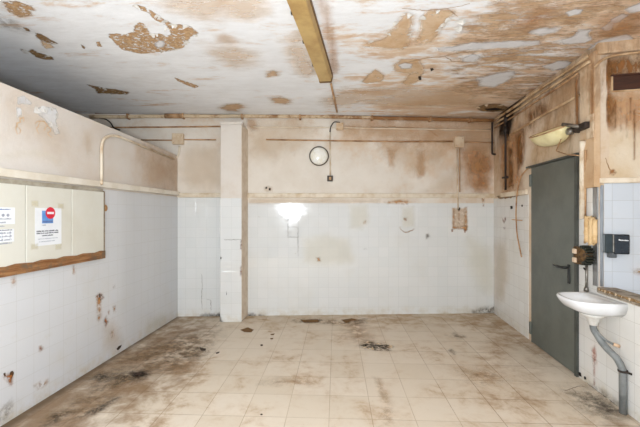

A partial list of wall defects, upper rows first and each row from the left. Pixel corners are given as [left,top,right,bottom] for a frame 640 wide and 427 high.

peeling [3,1,35,17]
peeling [21,33,58,60]
peeling [109,4,198,54]
peeling [363,0,640,99]
peeling [17,96,59,135]
peeling [89,85,129,95]
leakage [606,57,640,153]
leakage [466,150,489,185]
leakage [502,131,523,188]